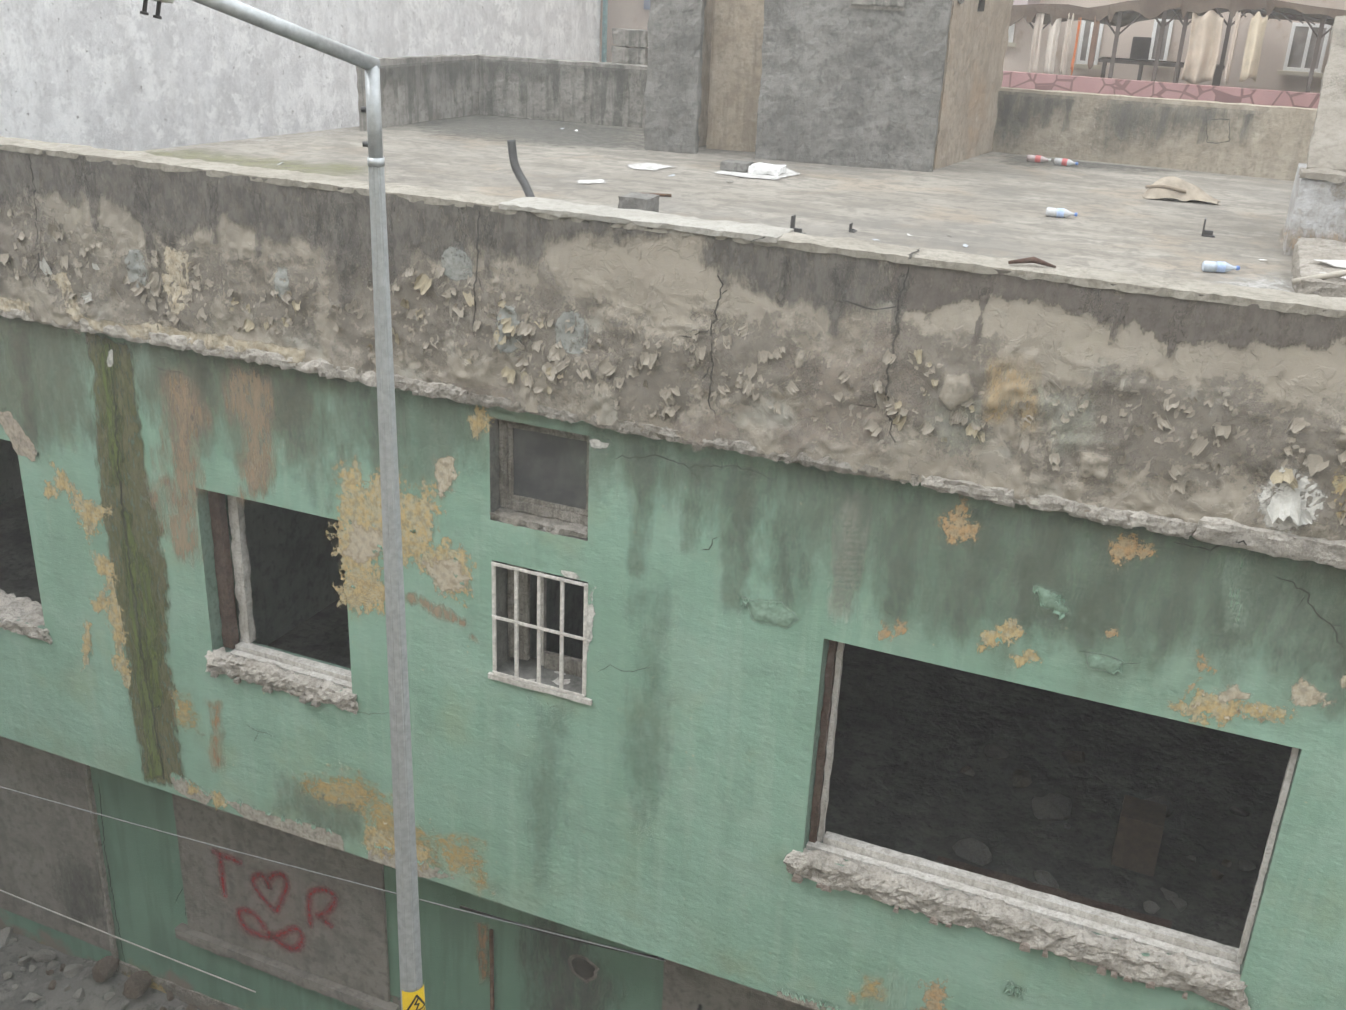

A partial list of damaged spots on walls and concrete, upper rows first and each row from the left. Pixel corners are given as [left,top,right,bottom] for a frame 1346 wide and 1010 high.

peeling [0,411,132,690]
water stain [100,340,124,487]
peeling [0,197,376,374]
peeling [326,455,385,618]
peeling [399,456,477,608]
peeling [390,246,1015,548]
crack [681,275,727,414]
crack [835,249,919,442]
peeling [1006,364,1346,570]
spalling [1167,649,1346,727]
spalling [170,772,345,852]
spalling [777,848,1251,1010]